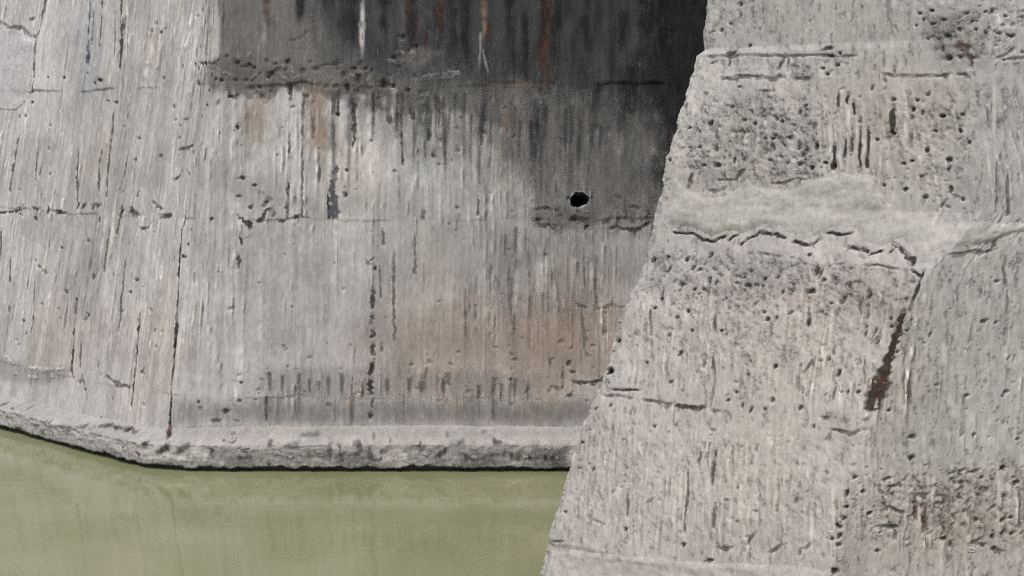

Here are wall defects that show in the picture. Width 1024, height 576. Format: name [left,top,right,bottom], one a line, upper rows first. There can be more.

leakage [219,0,708,219]
crack [674,231,924,439]